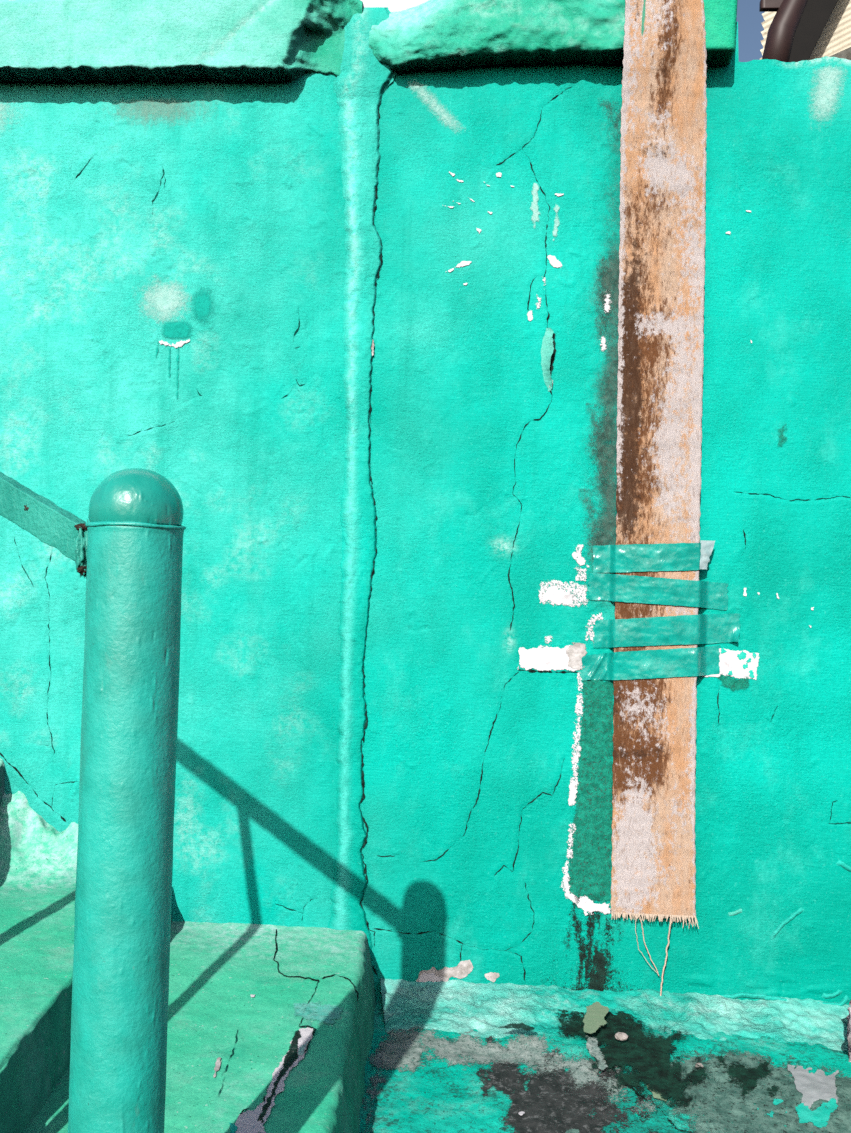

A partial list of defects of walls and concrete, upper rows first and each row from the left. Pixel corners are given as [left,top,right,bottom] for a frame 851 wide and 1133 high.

crack [373,166,383,326]
crack [496,86,572,328]
peeling [530,183,539,226]
peeling [553,193,564,240]
peeling [527,255,562,321]
peeling [541,328,556,391]
crack [734,491,851,501]
peeling [702,648,759,680]
crack [273,374,565,1027]
damp [563,680,633,992]
peeling [416,960,499,982]
spalling [229,1025,316,1133]